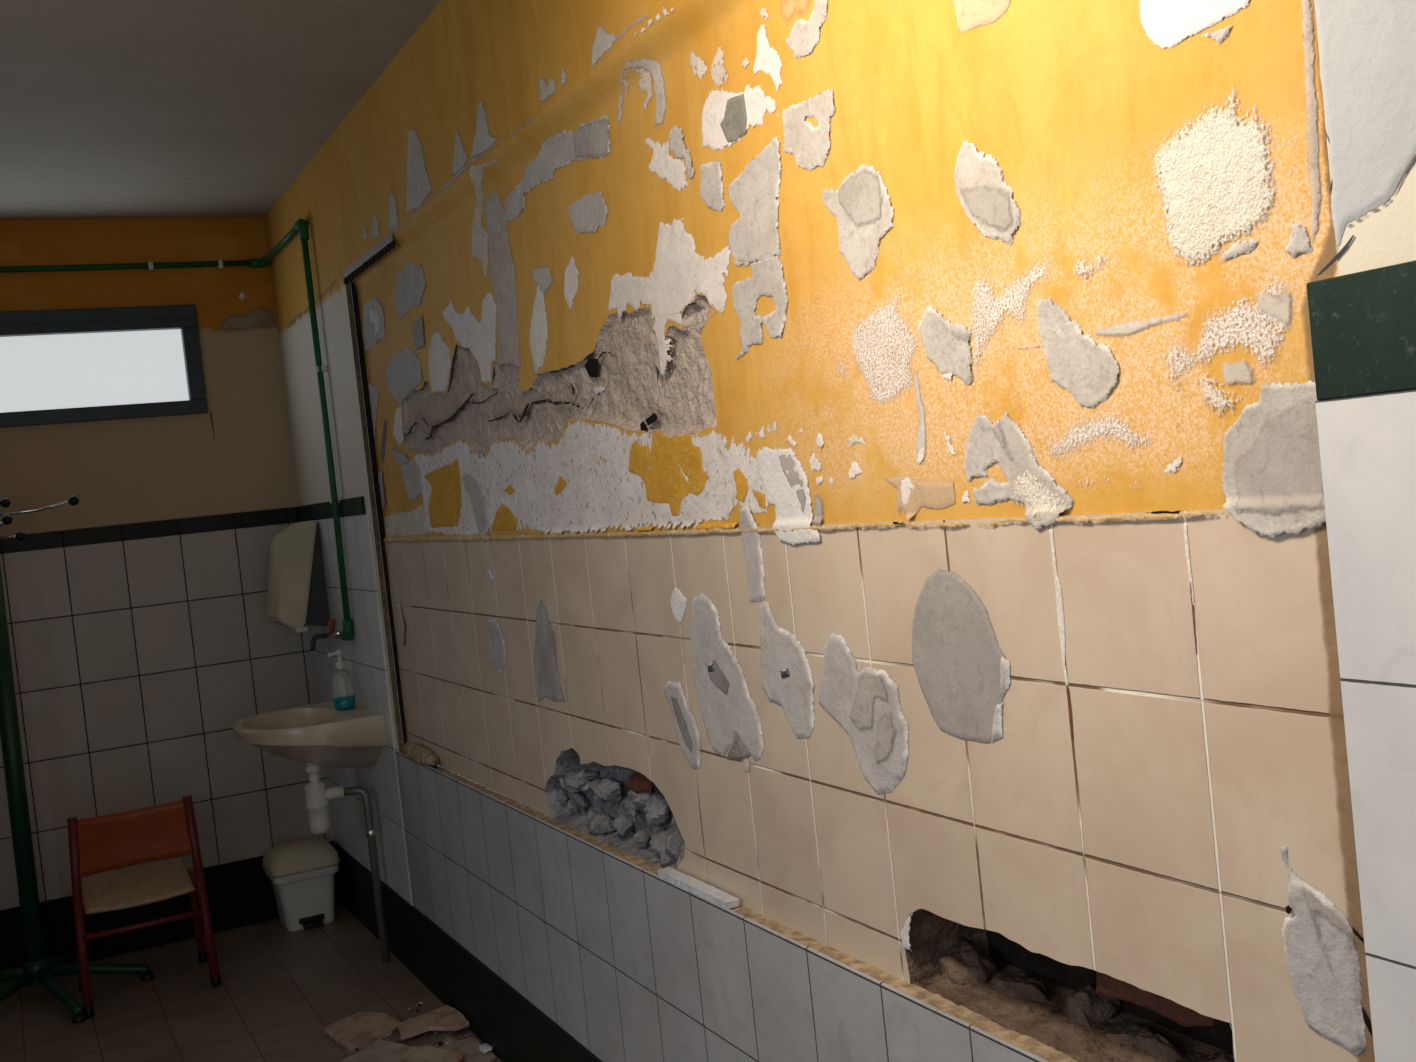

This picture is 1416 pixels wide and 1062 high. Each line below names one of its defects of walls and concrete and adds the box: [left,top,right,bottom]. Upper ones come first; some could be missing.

peeling [380,159,1224,542]
spalling [545,748,685,870]
spalling [900,909,1234,1062]